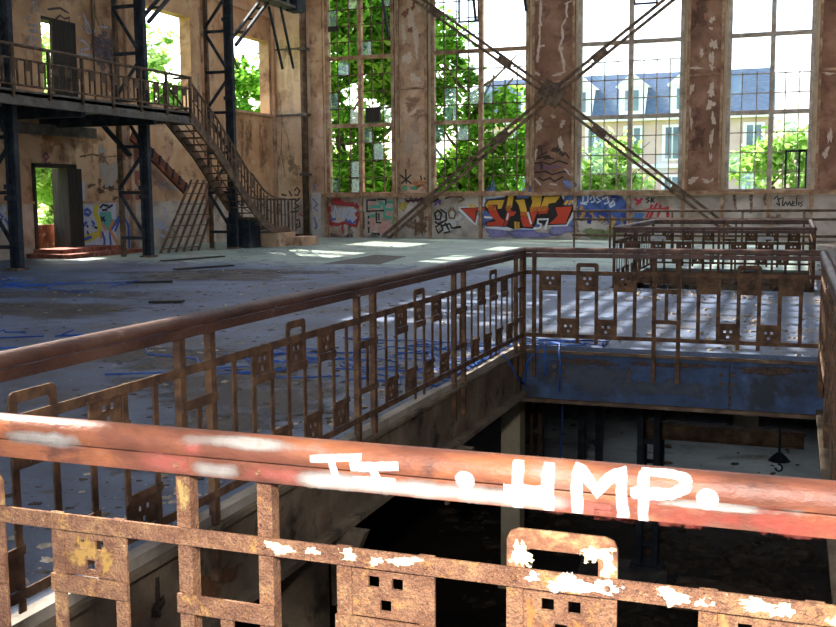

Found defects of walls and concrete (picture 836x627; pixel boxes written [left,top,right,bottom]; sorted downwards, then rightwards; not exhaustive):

peeling [685,16,718,70]
peeling [706,82,716,161]
corrosion [554,358,814,384]
peeling [67,535,112,574]
corrosion [201,563,238,597]
peeling [508,539,625,596]